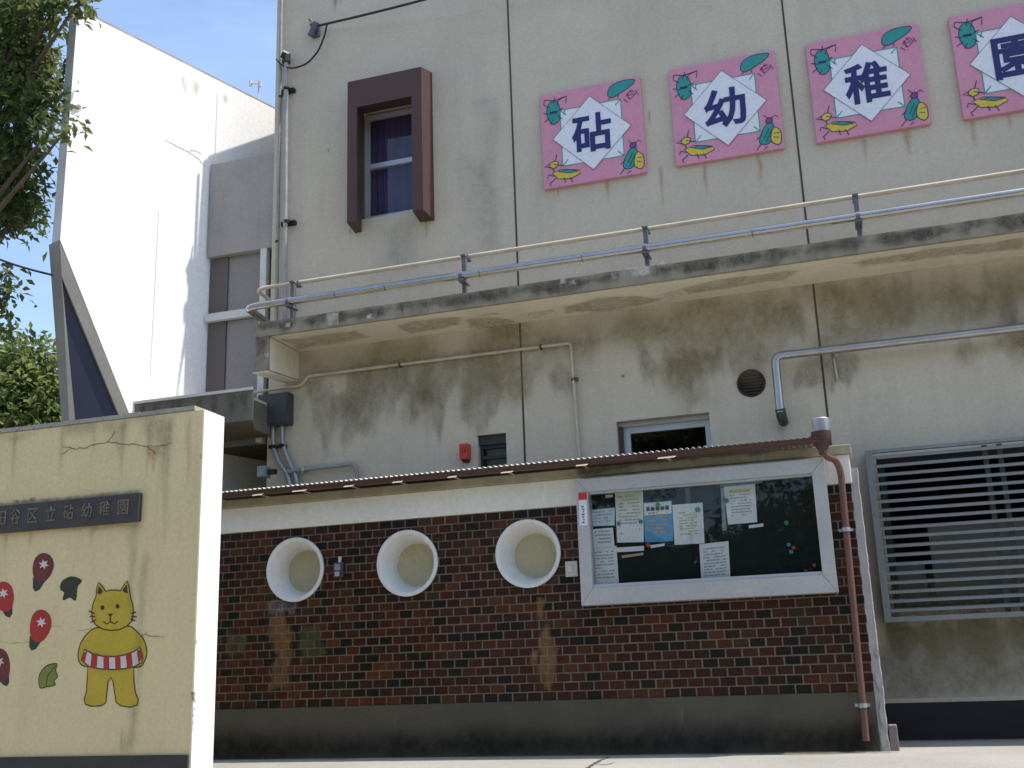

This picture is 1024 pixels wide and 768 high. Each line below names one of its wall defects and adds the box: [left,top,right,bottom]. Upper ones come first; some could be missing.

crack [60,435,172,455]